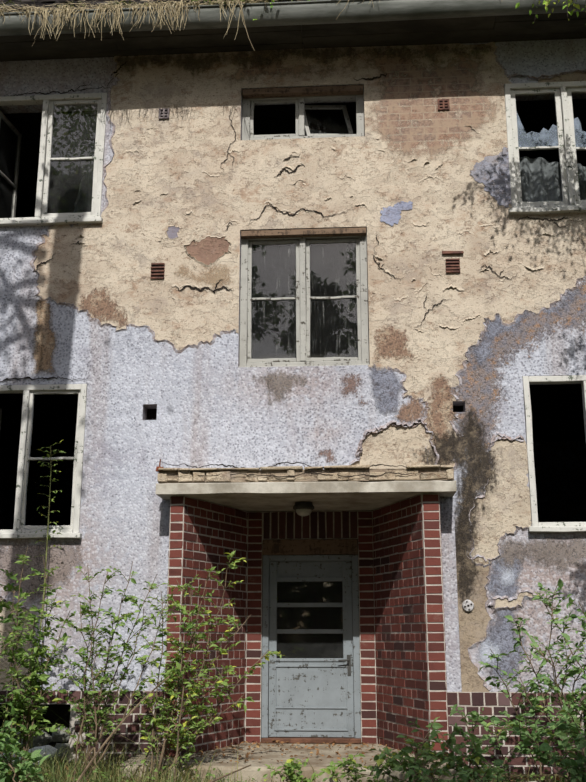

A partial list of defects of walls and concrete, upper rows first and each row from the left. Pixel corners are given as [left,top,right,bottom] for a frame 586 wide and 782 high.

crack [13,66,122,96]
crack [220,109,236,170]
crack [275,154,305,177]
crack [225,204,350,231]
flaking render [30,42,586,471]
crack [373,235,404,280]
crack [0,375,90,383]
leakage [340,278,586,602]
crack [154,461,451,478]
flaking render [456,431,537,692]